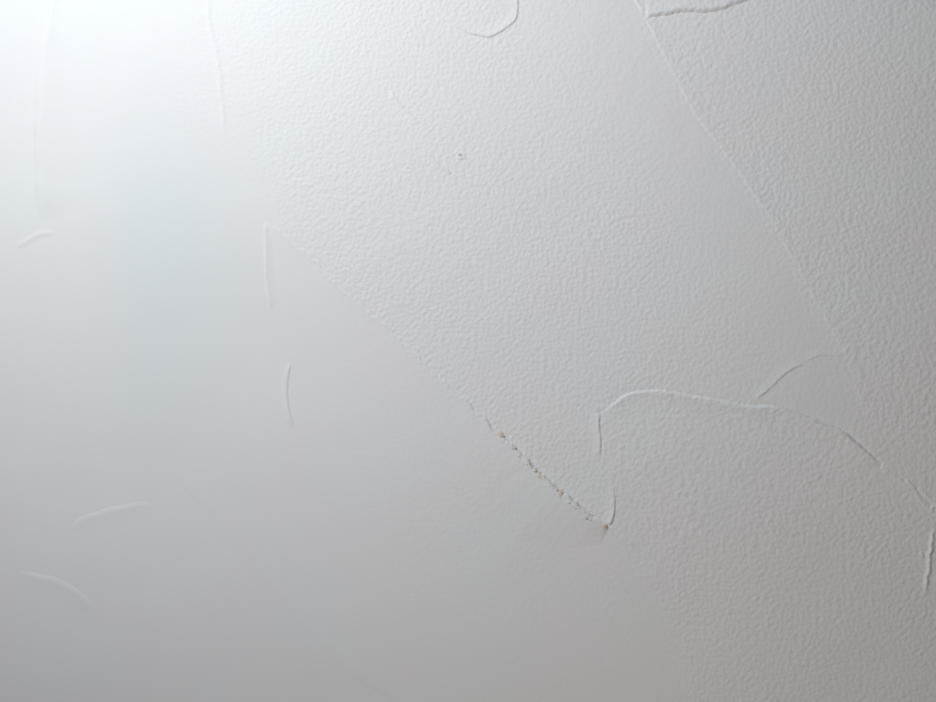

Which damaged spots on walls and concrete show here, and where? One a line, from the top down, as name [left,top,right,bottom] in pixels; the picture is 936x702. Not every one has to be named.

crack [644,0,748,18]